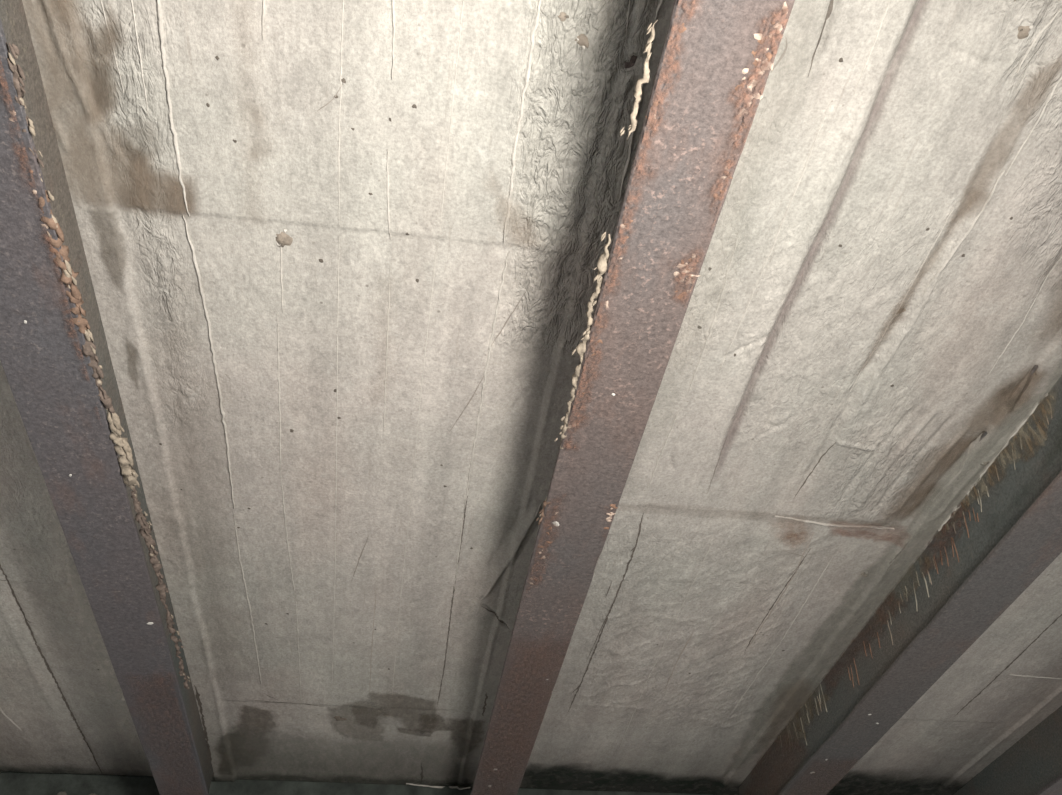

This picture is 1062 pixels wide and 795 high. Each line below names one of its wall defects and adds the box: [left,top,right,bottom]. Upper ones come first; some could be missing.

corrosion [564,0,698,450]
water stain [936,394,1055,538]
crack [0,565,102,773]
water stain [211,708,472,789]
crack [568,513,644,712]
crack [955,614,1062,716]